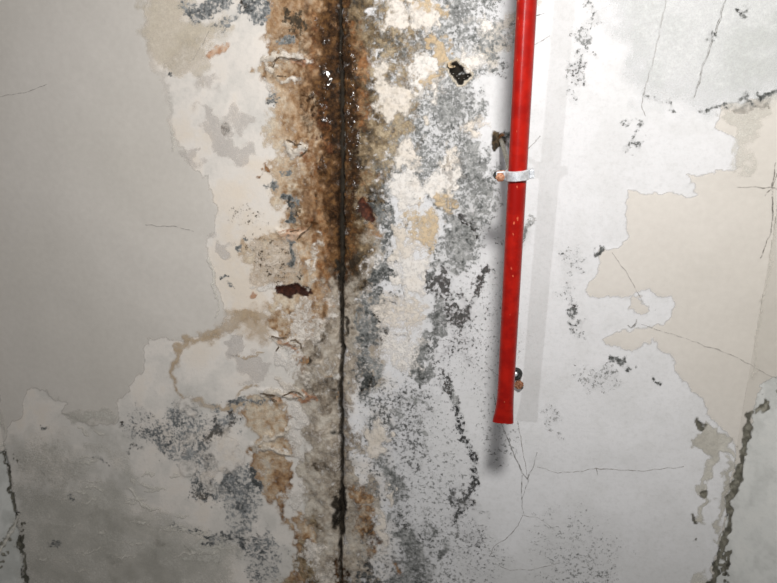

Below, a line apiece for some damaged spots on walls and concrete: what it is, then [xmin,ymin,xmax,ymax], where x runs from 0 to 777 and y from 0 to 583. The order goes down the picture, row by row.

peeling [0,0,346,583]
damp [169,212,390,583]
corrosion [239,0,423,358]
crack [331,0,350,583]
damp [307,16,376,231]
peeling [315,0,777,583]